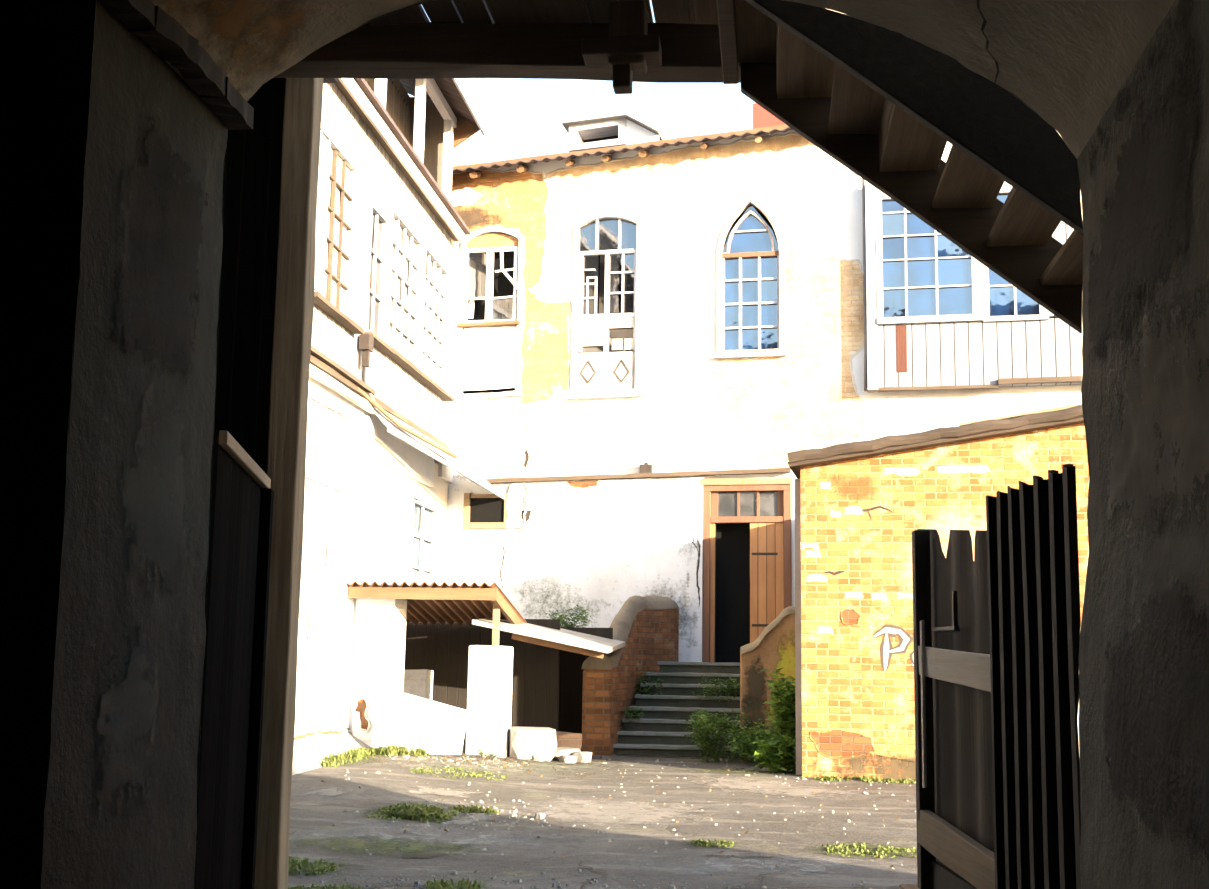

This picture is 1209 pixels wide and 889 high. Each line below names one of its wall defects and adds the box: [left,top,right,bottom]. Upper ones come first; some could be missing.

crack [977,0,999,83]
peeling [451,132,816,405]
peeling [708,237,867,471]
crack [846,506,893,519]
crack [692,530,700,605]
spalling [809,729,876,759]